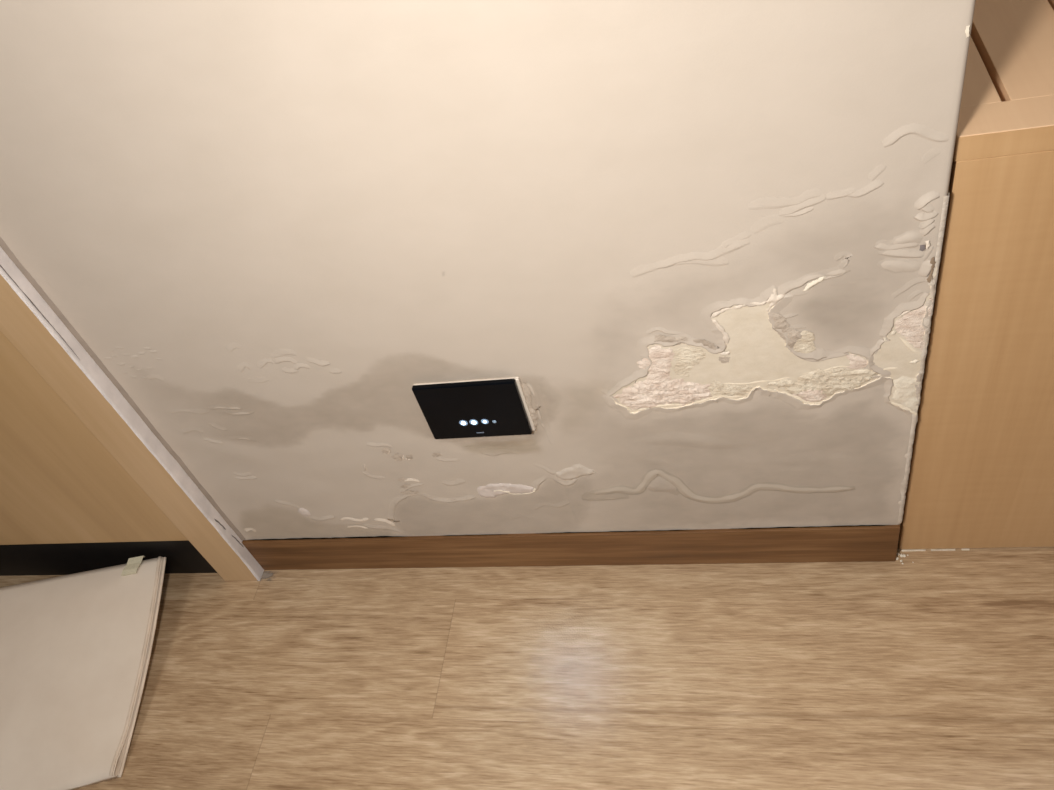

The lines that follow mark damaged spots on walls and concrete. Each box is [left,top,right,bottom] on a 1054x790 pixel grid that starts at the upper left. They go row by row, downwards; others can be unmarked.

peeling [601,191,949,523]